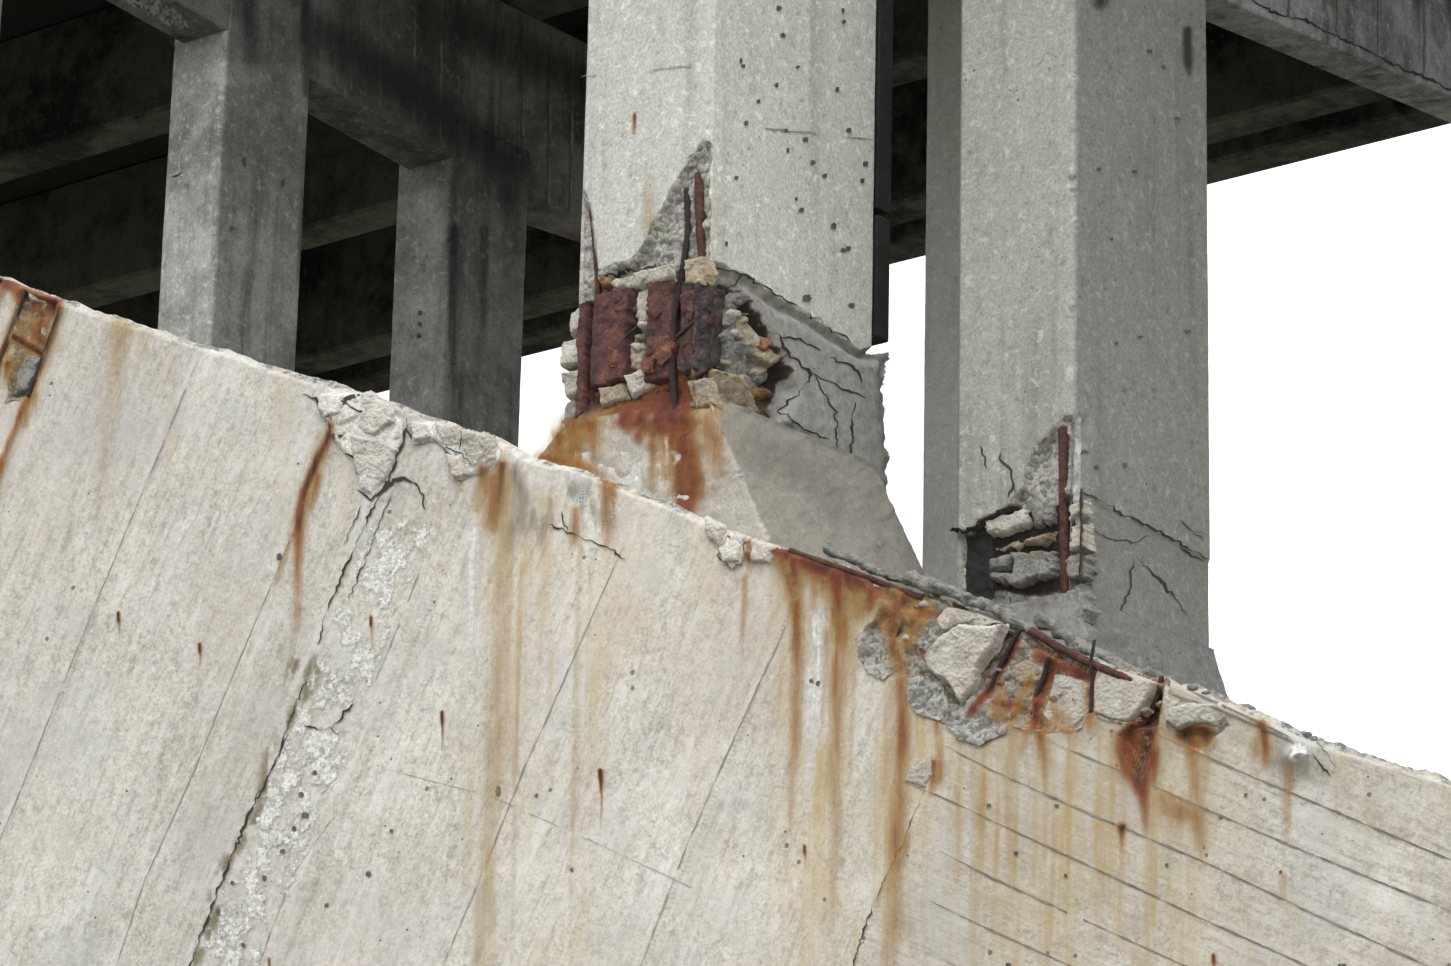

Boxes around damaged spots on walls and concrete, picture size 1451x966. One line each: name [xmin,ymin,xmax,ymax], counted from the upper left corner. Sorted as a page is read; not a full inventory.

corrosion [0,277,62,474]
corrosion [294,422,334,579]
peeling [198,507,432,966]
crack [549,512,625,559]
corrosion [534,370,720,521]
spalling [588,142,781,414]
crack [716,267,866,454]
corrosion [771,548,942,871]
spalling [788,529,1226,746]
spalling [1020,423,1100,593]
crack [1083,492,1208,613]
corrosion [1116,693,1198,829]